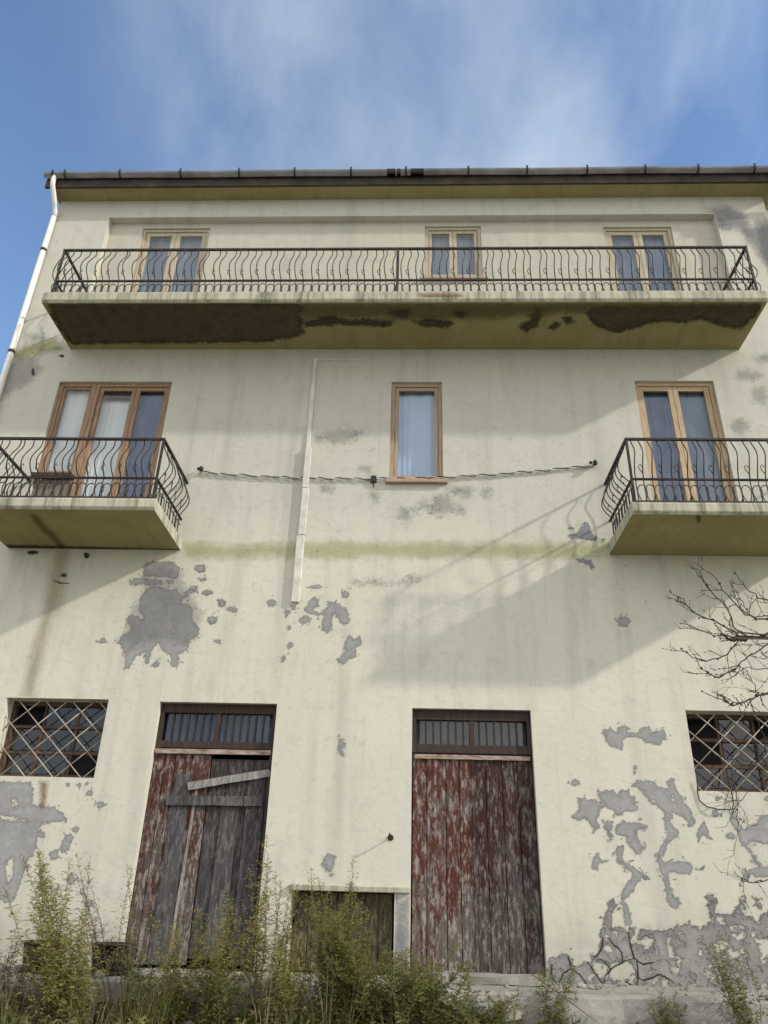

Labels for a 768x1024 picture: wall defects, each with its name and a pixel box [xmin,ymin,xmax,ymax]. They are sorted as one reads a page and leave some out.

damp [287,303,756,318]
peeling [568,522,605,542]
peeling [96,557,238,669]
peeling [264,584,362,665]
peeling [615,613,631,627]
peeling [603,722,671,751]
peeling [66,781,107,811]
peeling [0,780,80,908]
peeling [321,850,337,876]
spalling [548,764,768,990]
crack [550,932,671,985]